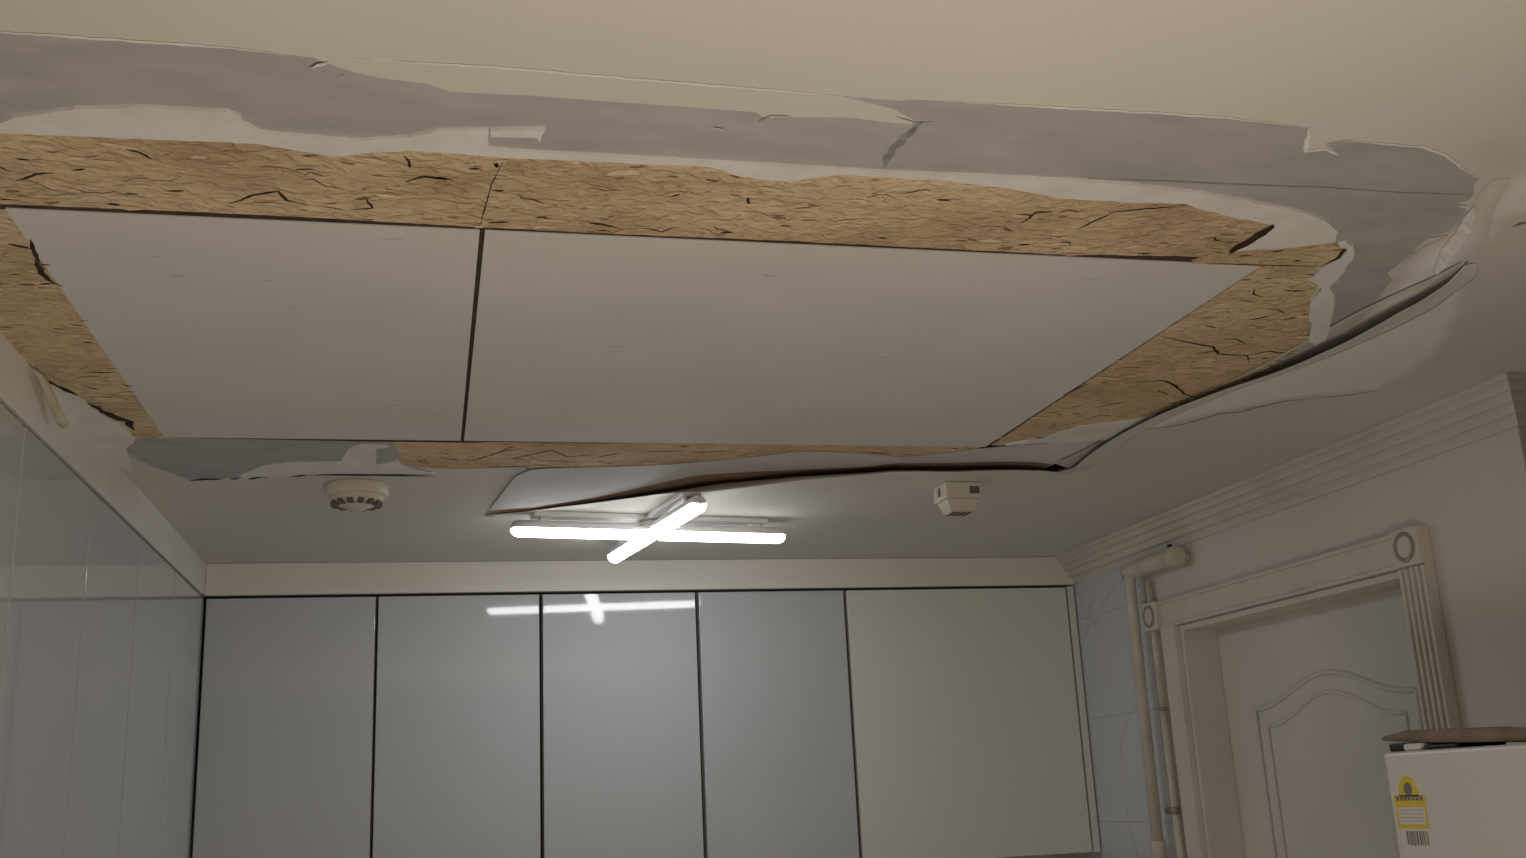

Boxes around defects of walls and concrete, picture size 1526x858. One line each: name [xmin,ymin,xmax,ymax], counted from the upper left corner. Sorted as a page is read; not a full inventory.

peeling [1143,169,1526,432]